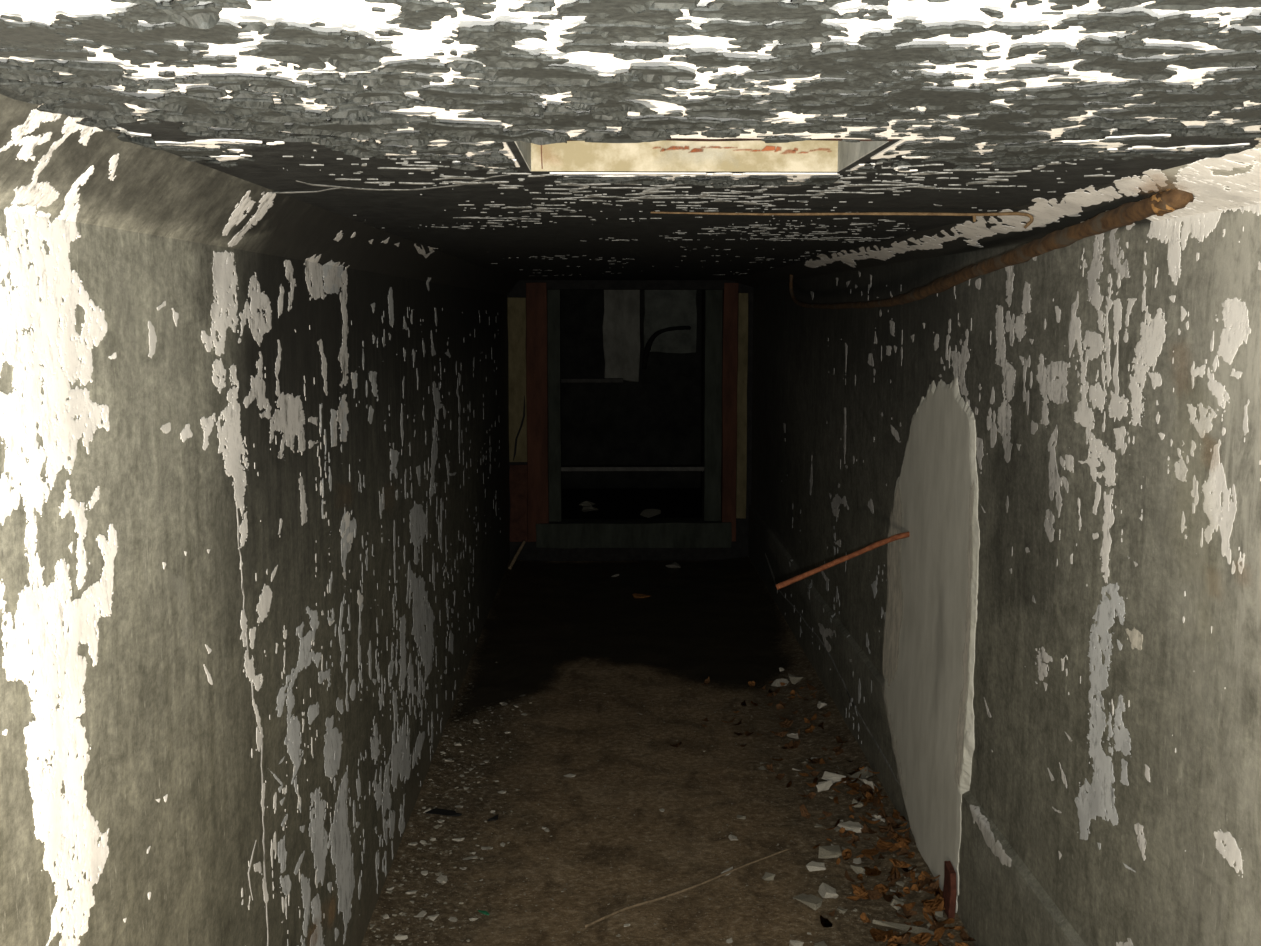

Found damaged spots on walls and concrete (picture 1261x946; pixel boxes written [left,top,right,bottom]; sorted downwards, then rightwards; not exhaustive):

peeling [109,153,119,181]
peeling [148,301,179,358]
peeling [868,309,914,380]
peeling [829,407,857,517]
peeling [1156,295,1251,574]
peeling [161,190,528,946]
peeling [785,533,850,652]
peeling [922,223,1167,850]
peeling [970,805,1012,867]
peeling [1123,822,1147,872]
peeling [1214,829,1243,878]